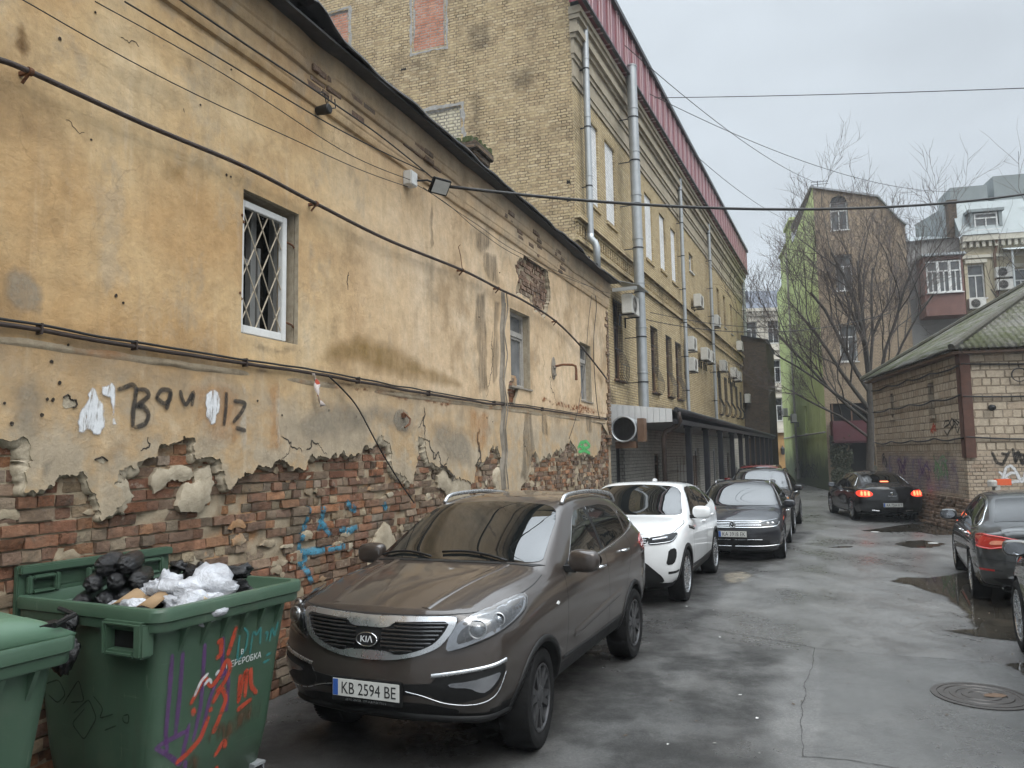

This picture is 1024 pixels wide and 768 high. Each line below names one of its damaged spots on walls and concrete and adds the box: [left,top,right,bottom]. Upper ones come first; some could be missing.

spalling [505,210,566,318]
spalling [0,337,249,375]
crack [281,437,327,462]
crack [419,408,482,481]
spalling [375,375,609,494]
spalling [0,436,500,700]
spalling [30,698,54,768]
crack [674,622,896,768]